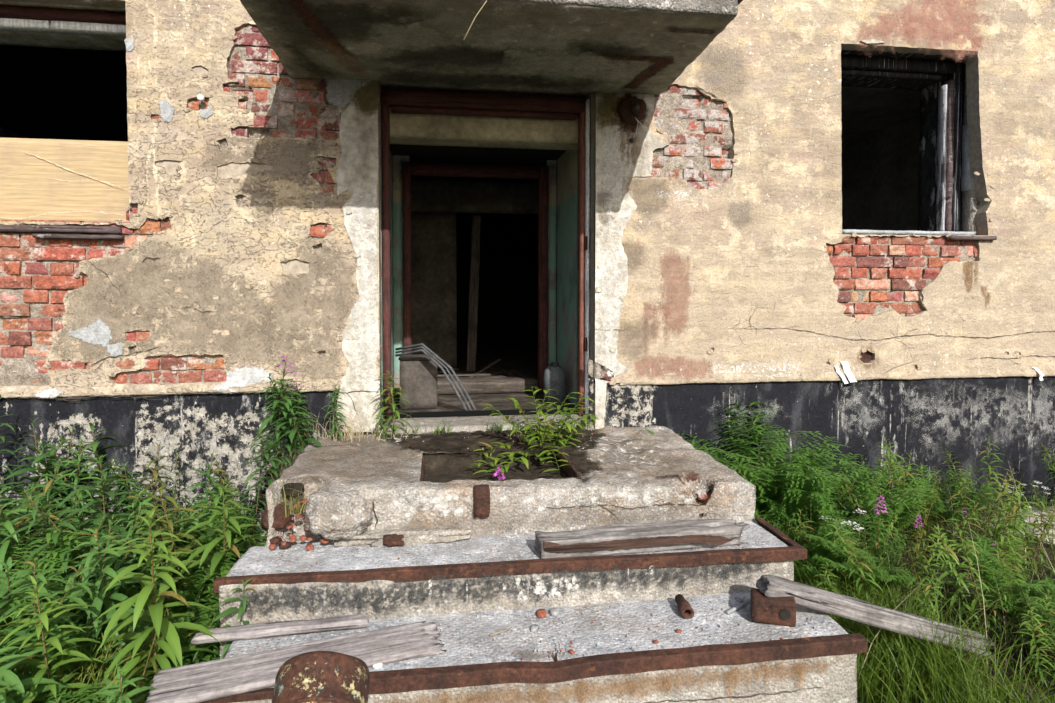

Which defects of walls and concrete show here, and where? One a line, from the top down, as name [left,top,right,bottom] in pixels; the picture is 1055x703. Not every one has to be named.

flaking render [156,160,182,177]
flaking render [183,24,341,193]
flaking render [651,84,739,190]
flaking render [824,232,981,323]
flaking render [0,193,379,504]
crack [729,291,1055,364]
water stain [723,394,778,423]
water stain [841,381,878,428]
water stain [907,389,1055,442]